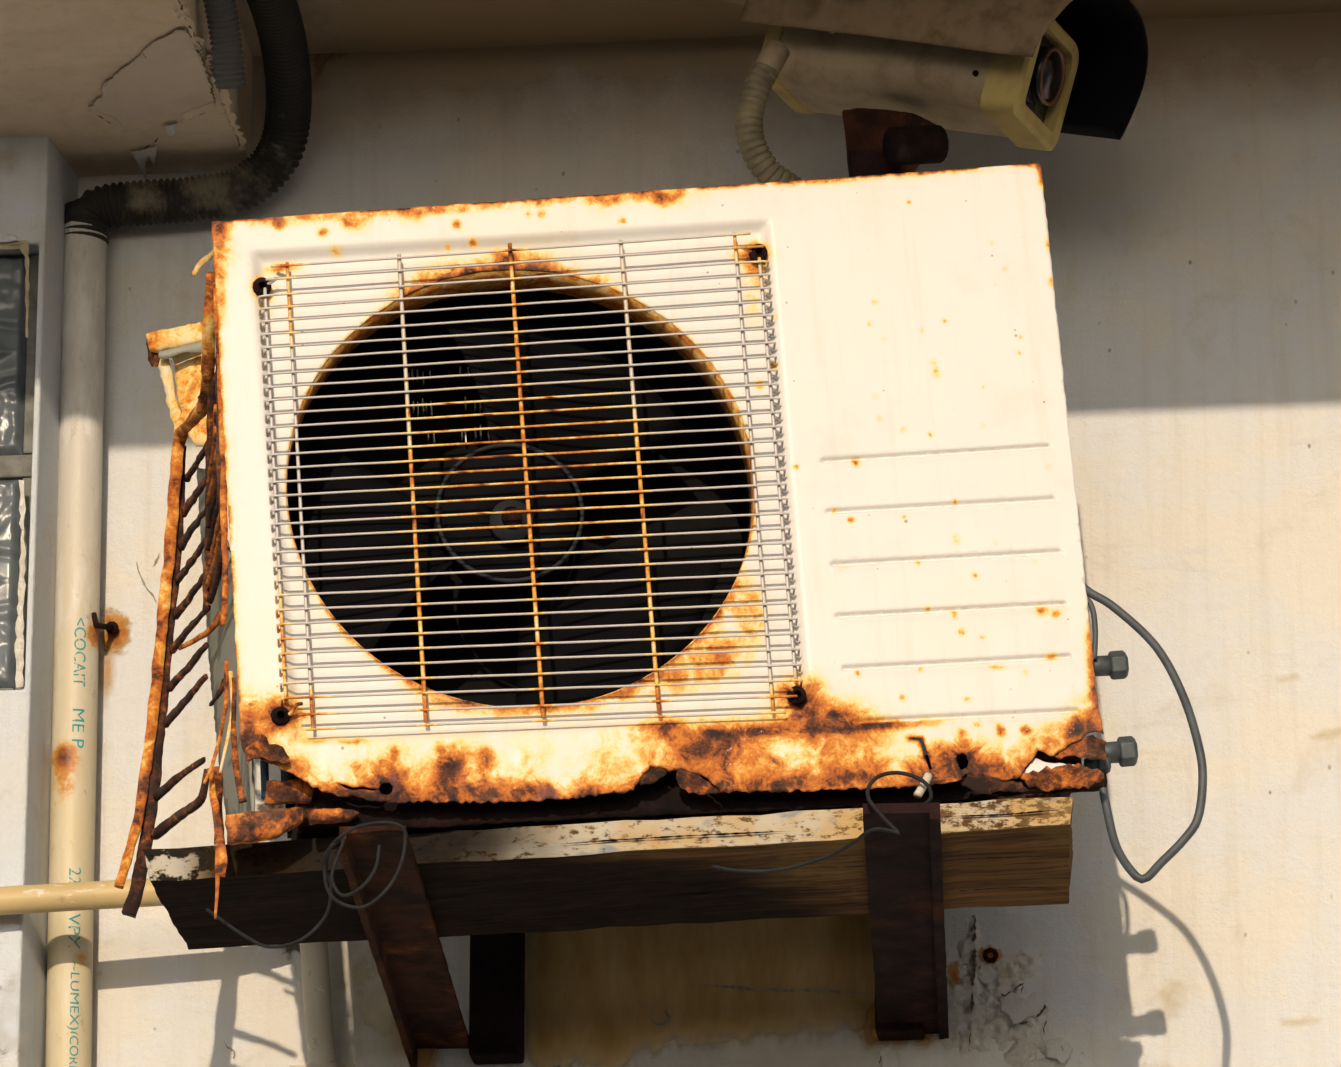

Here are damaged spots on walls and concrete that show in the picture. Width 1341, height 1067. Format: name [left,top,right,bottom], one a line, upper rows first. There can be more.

peeling [89,0,247,179]
leakage [525,915,875,1067]
spalling [937,919,1084,1067]